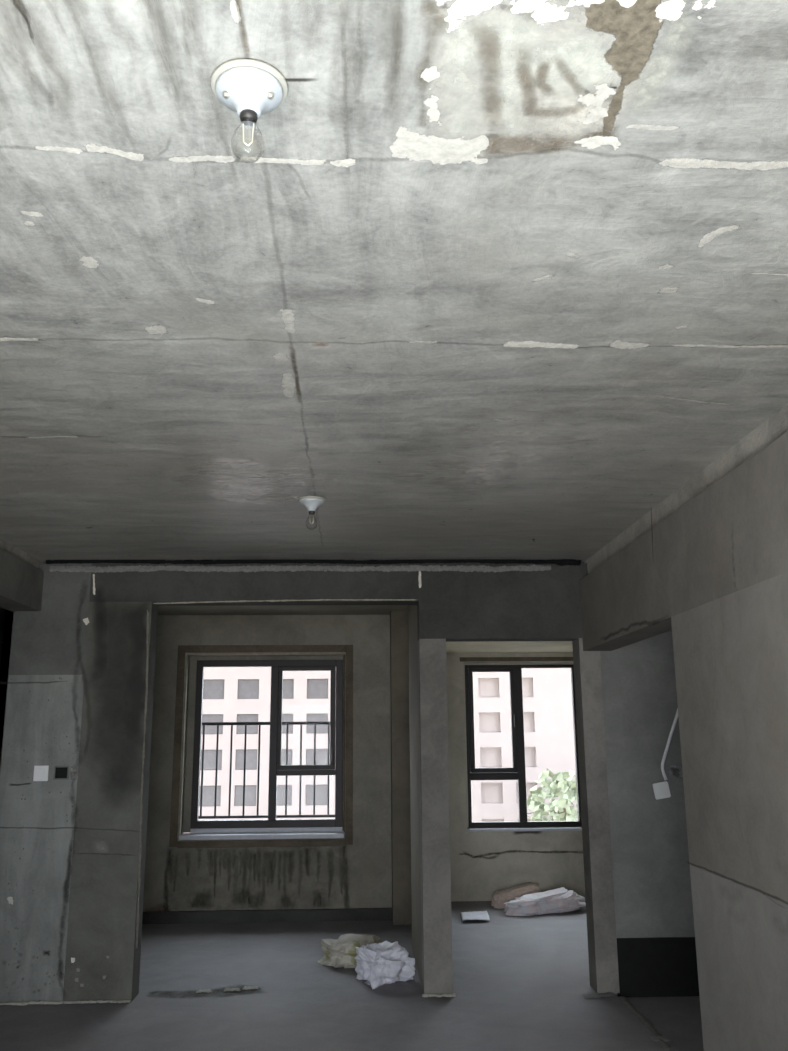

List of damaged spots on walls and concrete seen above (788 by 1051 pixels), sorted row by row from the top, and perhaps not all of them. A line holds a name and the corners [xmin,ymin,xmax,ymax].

crack [230,0,247,48]
peeling [390,0,716,169]
crack [626,123,679,131]
crack [34,143,356,167]
crack [658,158,788,171]
crack [20,210,43,218]
crack [144,324,168,334]
crack [0,335,39,343]
crack [503,341,579,349]
crack [610,340,788,349]
crack [272,309,300,398]